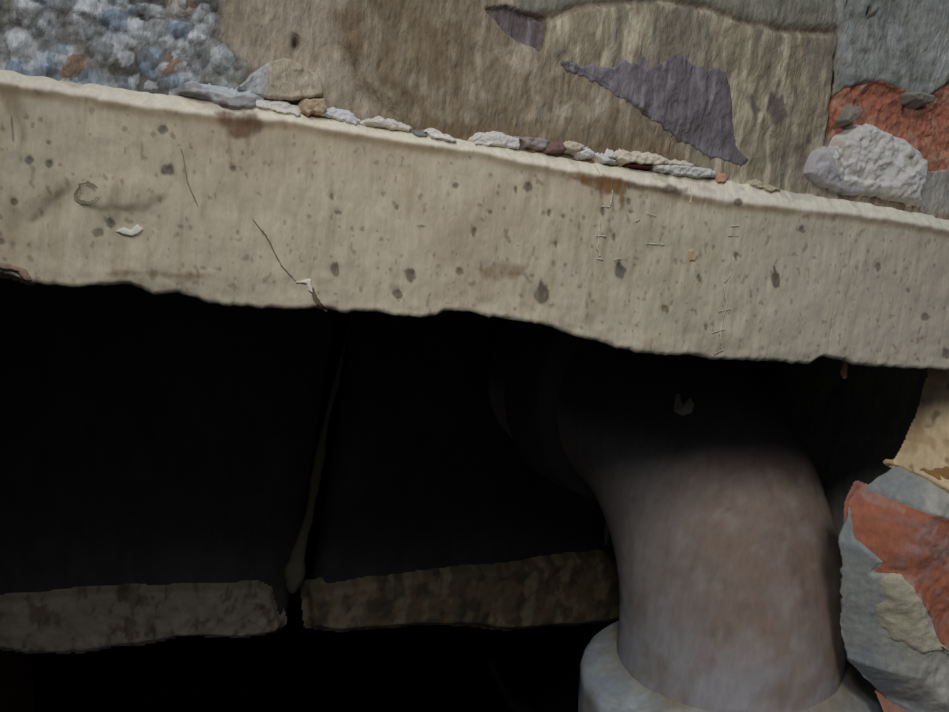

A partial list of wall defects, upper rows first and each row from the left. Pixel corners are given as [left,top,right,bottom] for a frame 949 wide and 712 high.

spalling [256,97,728,203]
spalling [745,179,781,192]
flaking render [827,81,949,171]
spalling [0,263,37,285]
crack [253,220,327,312]
flaking render [883,368,949,493]
flaking render [844,481,949,652]
flaking render [875,689,906,712]